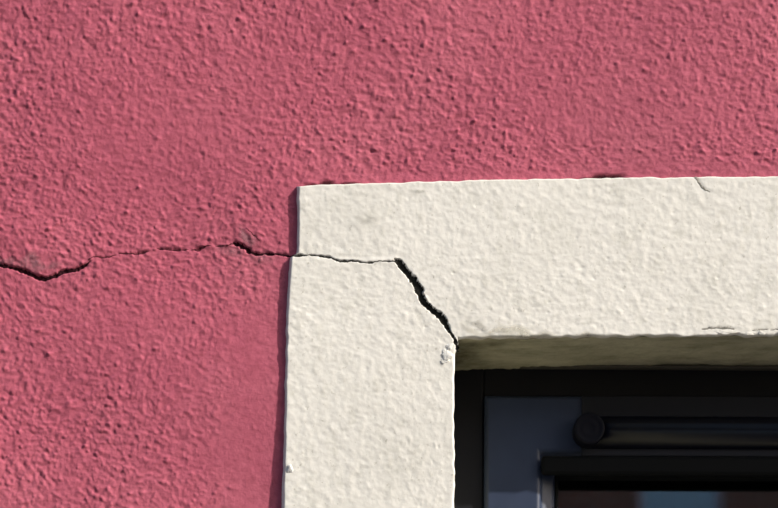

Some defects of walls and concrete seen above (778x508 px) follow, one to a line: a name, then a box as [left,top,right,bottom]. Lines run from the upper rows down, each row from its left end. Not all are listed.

crack [0,229,459,352]